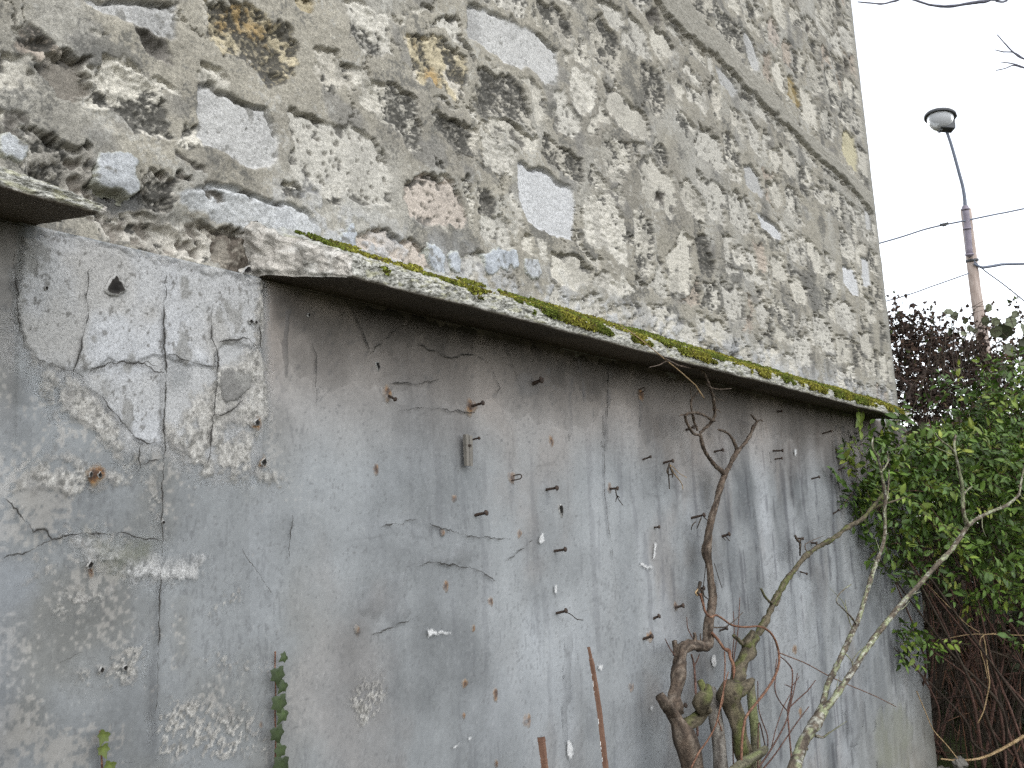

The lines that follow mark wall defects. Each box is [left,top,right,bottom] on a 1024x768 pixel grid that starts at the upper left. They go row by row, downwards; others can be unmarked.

damp [8,272,267,480]
peeling [13,226,281,484]
crack [395,331,525,413]
crack [4,254,265,707]
crack [383,519,531,581]
damp [561,628,573,743]